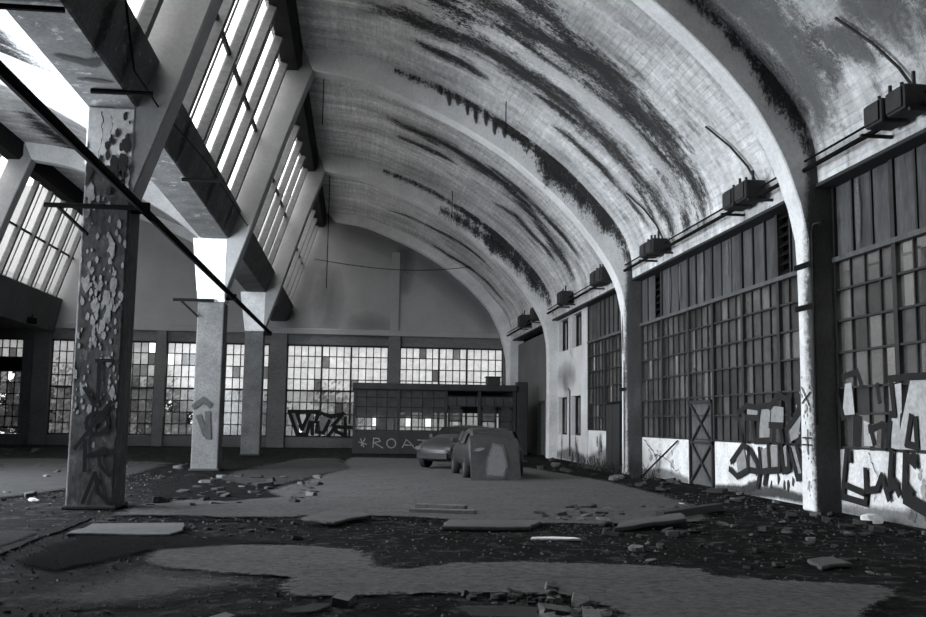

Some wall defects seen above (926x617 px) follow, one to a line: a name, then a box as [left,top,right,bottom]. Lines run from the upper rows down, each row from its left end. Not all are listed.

peeling [73,112,131,414]
leakage [413,38,489,80]
leakage [383,170,551,307]
leakage [394,68,628,261]
leakage [442,0,690,234]
leakage [689,0,926,155]